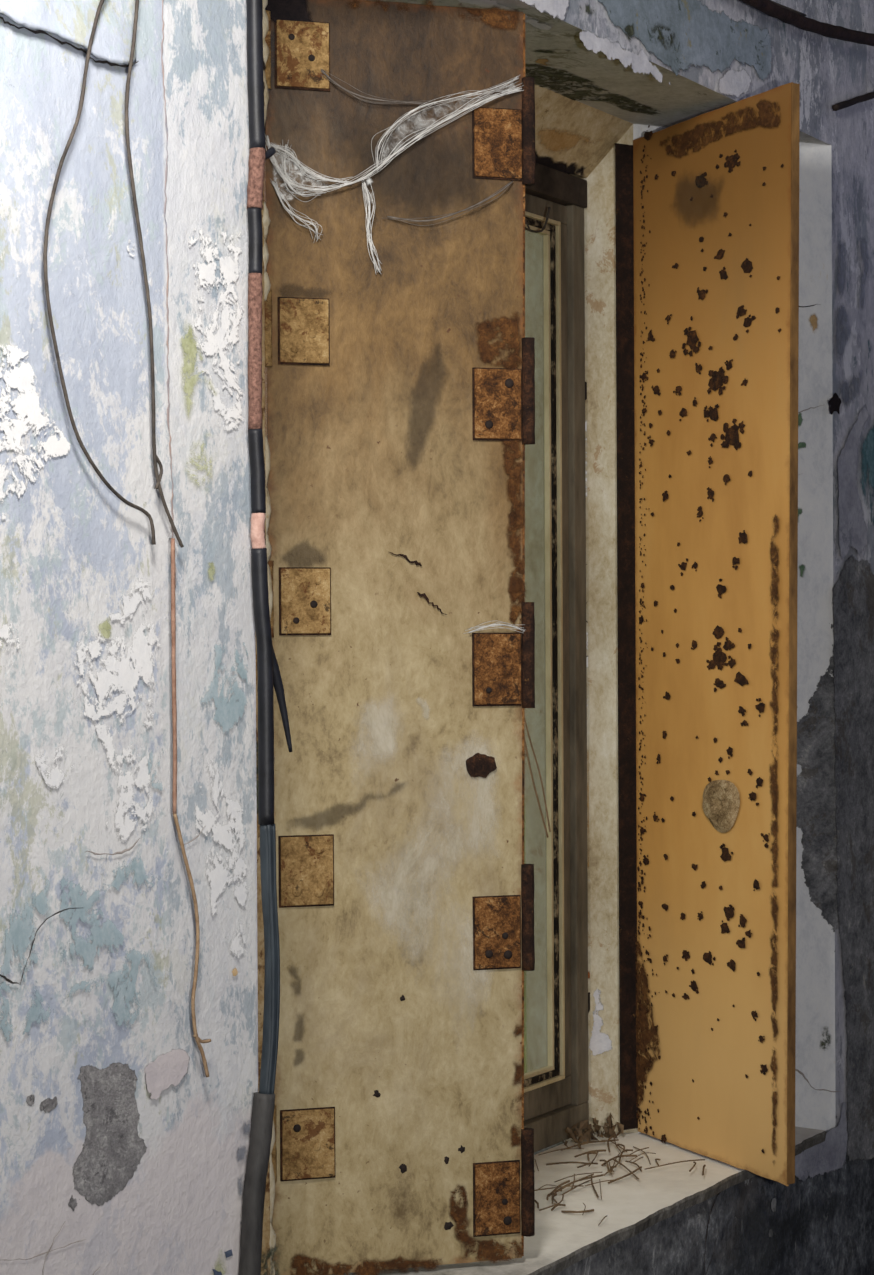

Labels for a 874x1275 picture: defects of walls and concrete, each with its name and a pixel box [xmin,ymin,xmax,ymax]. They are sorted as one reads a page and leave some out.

peeling [836,244,851,359]
peeling [829,373,862,414]
peeling [861,426,874,523]
spalling [795,555,874,1182]
spalling [68,1048,190,1211]